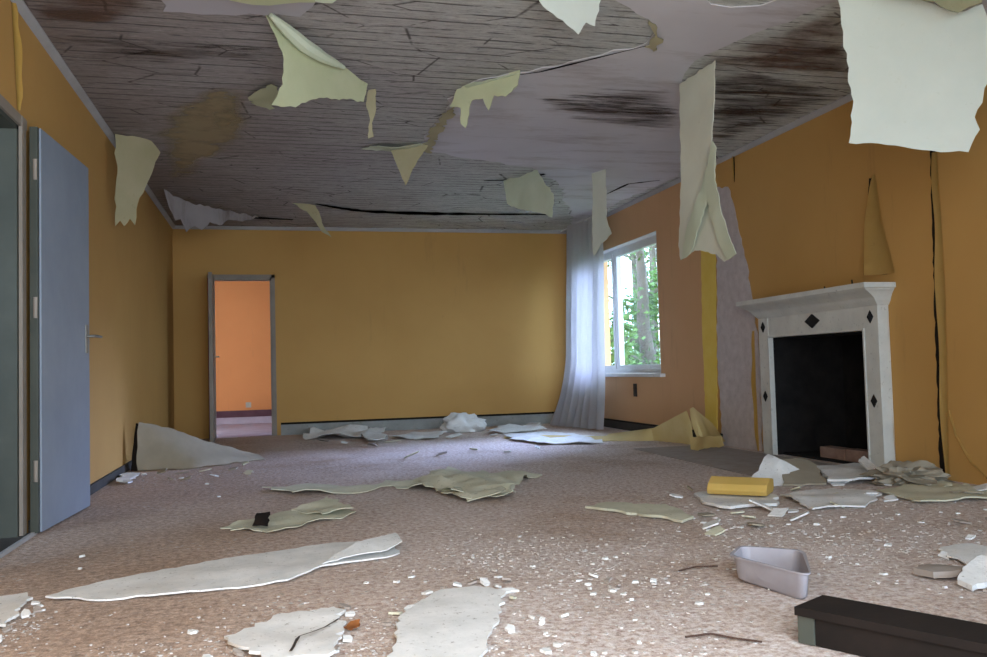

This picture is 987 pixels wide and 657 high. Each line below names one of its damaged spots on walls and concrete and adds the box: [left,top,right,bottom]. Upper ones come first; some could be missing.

damp [713,21,841,138]
damp [544,90,671,126]
crack [252,214,293,222]
crack [317,204,546,216]